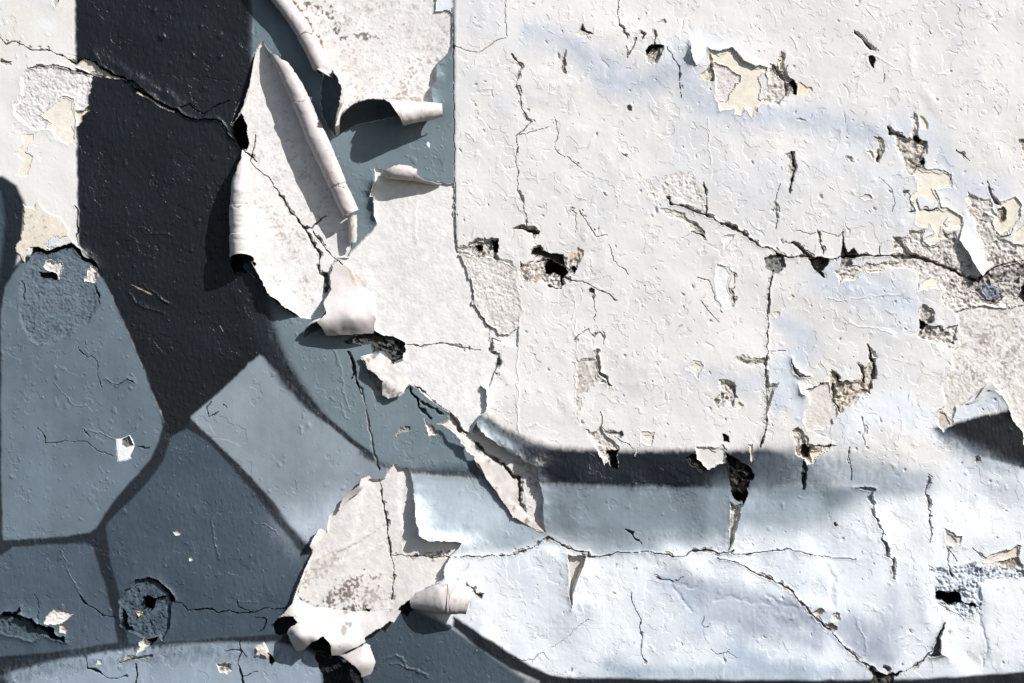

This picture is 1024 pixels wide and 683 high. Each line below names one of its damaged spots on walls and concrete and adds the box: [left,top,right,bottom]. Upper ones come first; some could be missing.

spalling [13,66,93,177]
crack [0,39,343,294]
crack [451,3,582,253]
peeling [691,34,813,118]
peeling [229,0,617,683]
spalling [586,414,655,469]
spalling [792,344,879,490]
crack [666,182,1021,448]
spalling [808,111,1024,433]
spalling [0,609,74,643]
crack [379,479,932,679]
spalling [929,528,1024,658]